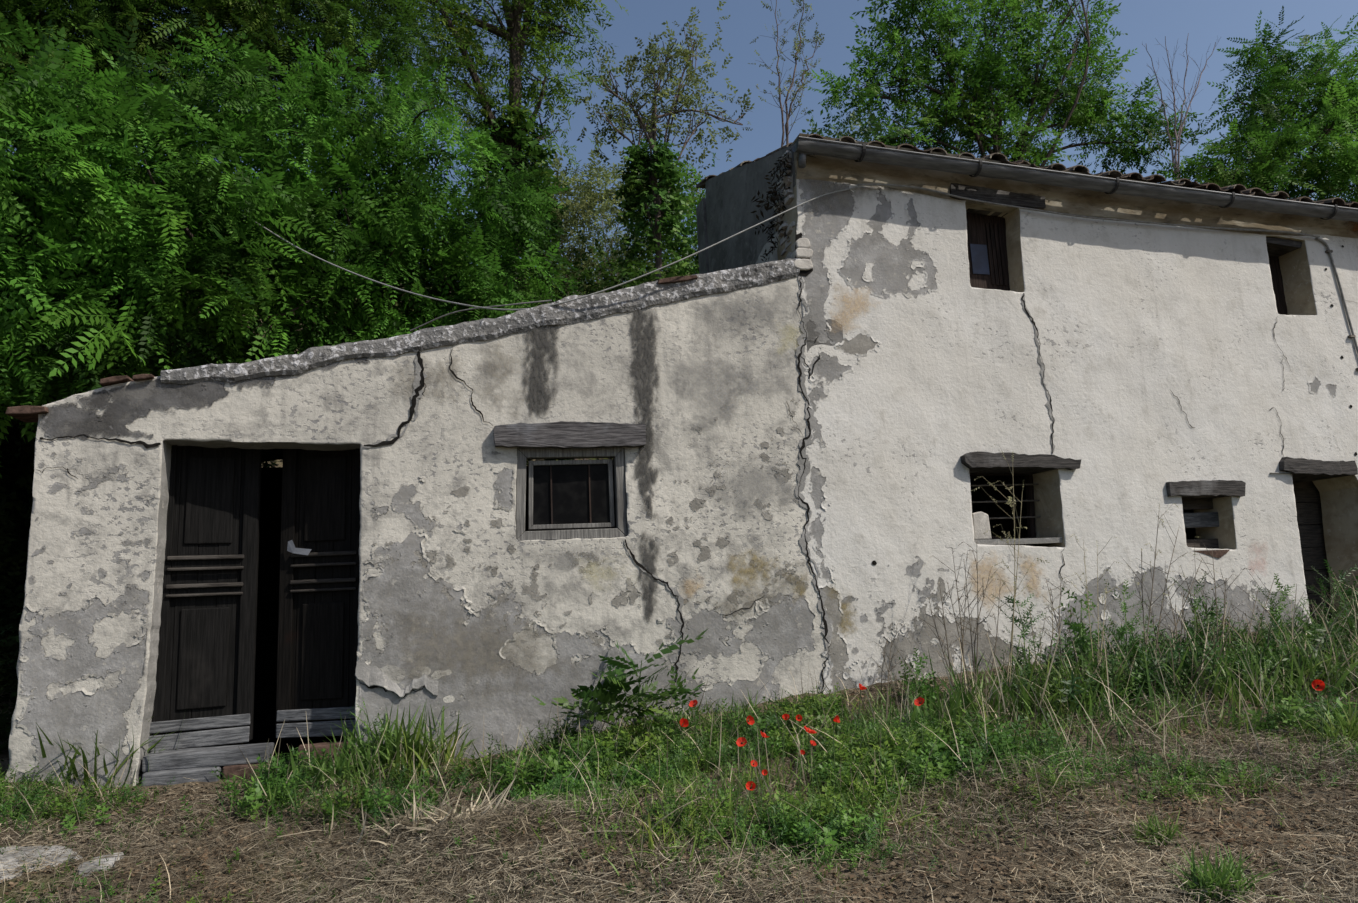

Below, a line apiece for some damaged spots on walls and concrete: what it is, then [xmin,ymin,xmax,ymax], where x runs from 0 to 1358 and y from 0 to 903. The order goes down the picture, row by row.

crack [363,350,492,448]
damp [523,325,558,415]
damp [630,309,659,519]
crack [786,275,834,693]
peeling [358,150,1308,760]
crack [1021,293,1055,454]
peeling [9,527,151,790]
damp [639,534,658,620]
crack [624,539,713,713]